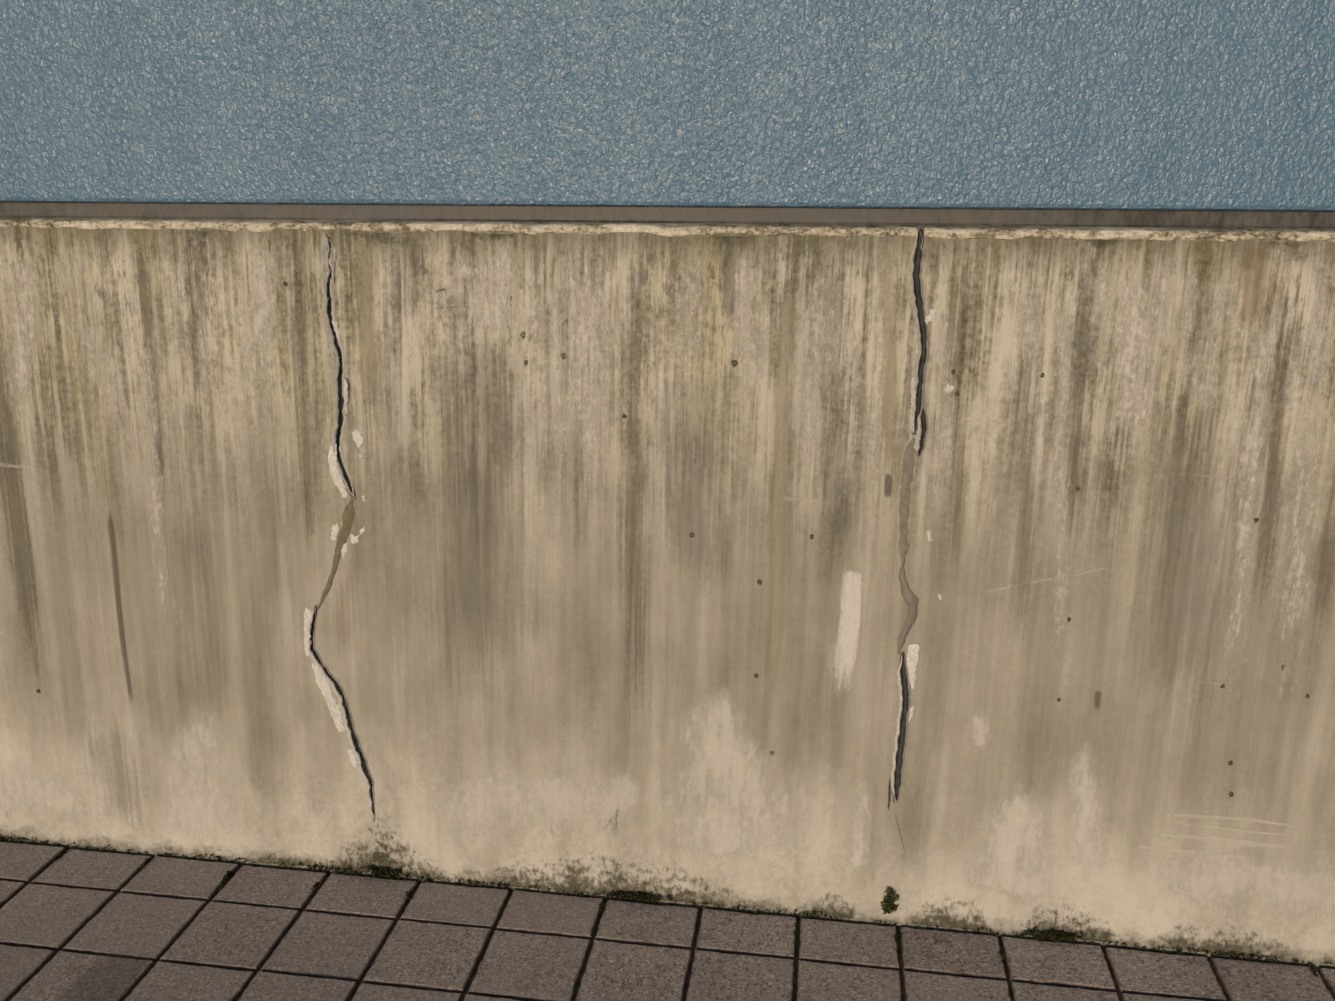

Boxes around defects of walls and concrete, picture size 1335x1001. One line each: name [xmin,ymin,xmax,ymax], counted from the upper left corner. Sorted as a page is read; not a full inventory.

damp [0,263,40,637]
crack [304,233,375,822]
damp [436,245,534,334]
damp [550,262,620,460]
damp [771,276,841,676]
crack [887,228,954,851]
damp [1053,296,1069,638]
damp [1089,269,1235,427]
damp [1226,302,1329,646]
damp [450,774,638,829]
damp [665,694,789,856]
damp [1070,747,1102,865]